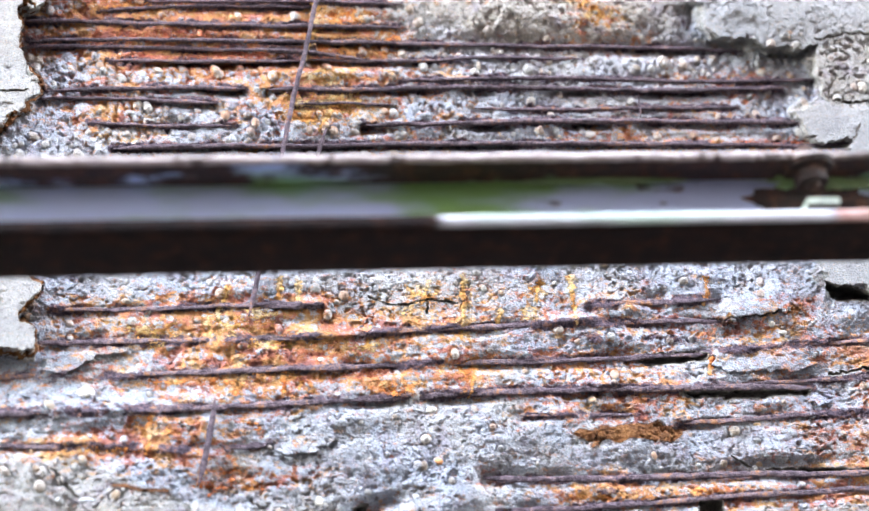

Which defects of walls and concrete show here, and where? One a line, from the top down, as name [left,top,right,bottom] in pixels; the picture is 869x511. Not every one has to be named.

crack [814,30,869,42]
rust [75,0,412,133]
spalling [0,0,869,157]
peeling [509,177,687,185]
peeling [825,176,869,190]
rust [740,187,869,210]
rust [124,275,387,357]
rust [138,367,325,397]
spalling [0,261,869,511]
rust [572,419,684,449]
rust [111,483,170,493]
rust [192,454,272,497]